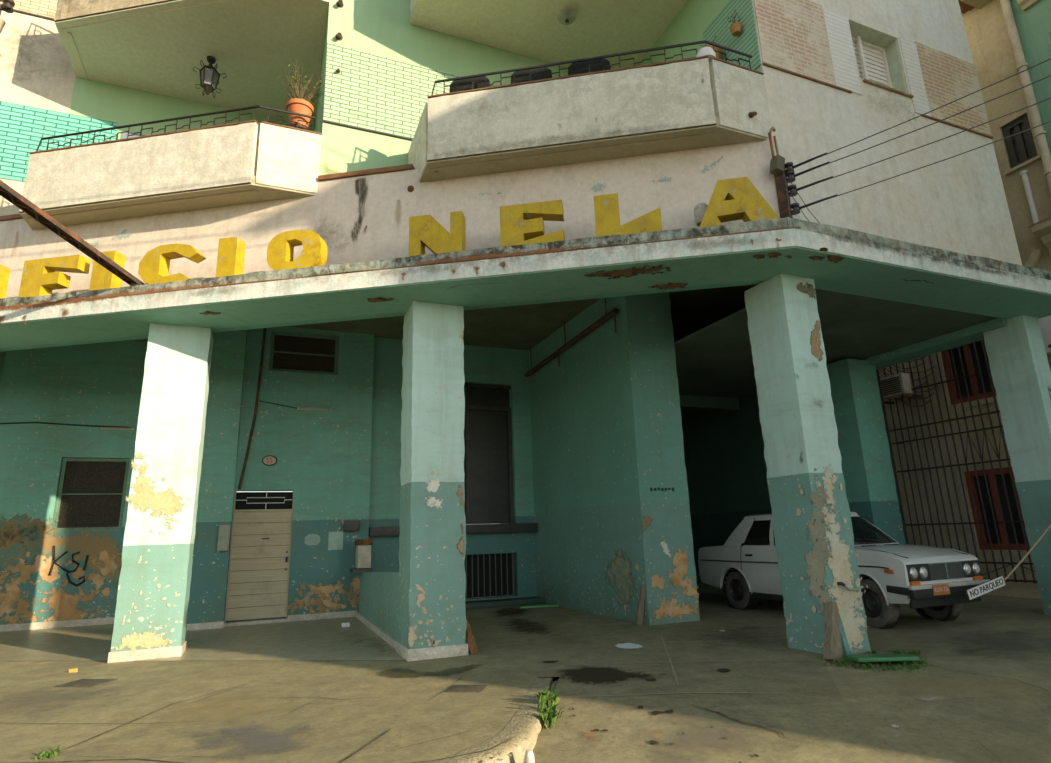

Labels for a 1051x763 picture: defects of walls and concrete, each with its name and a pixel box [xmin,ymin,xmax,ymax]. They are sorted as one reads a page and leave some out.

water stain [352,178,368,240]
spalling [809,320,825,361]
peeling [126,452,189,535]
peeling [425,471,443,508]
peeling [0,513,123,624]
peeling [116,589,173,650]
peeling [285,576,360,620]
peeling [407,584,458,647]
peeling [635,541,699,621]
peeling [796,463,878,653]